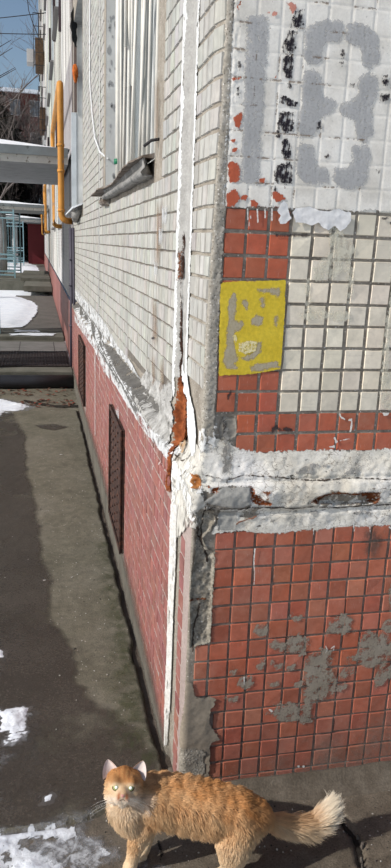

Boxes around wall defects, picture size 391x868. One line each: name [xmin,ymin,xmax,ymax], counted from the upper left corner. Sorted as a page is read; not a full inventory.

spalling [165,0,272,648]
crack [206,472,391,525]
spalling [310,490,381,516]
crack [196,503,215,562]
crack [192,603,200,652]